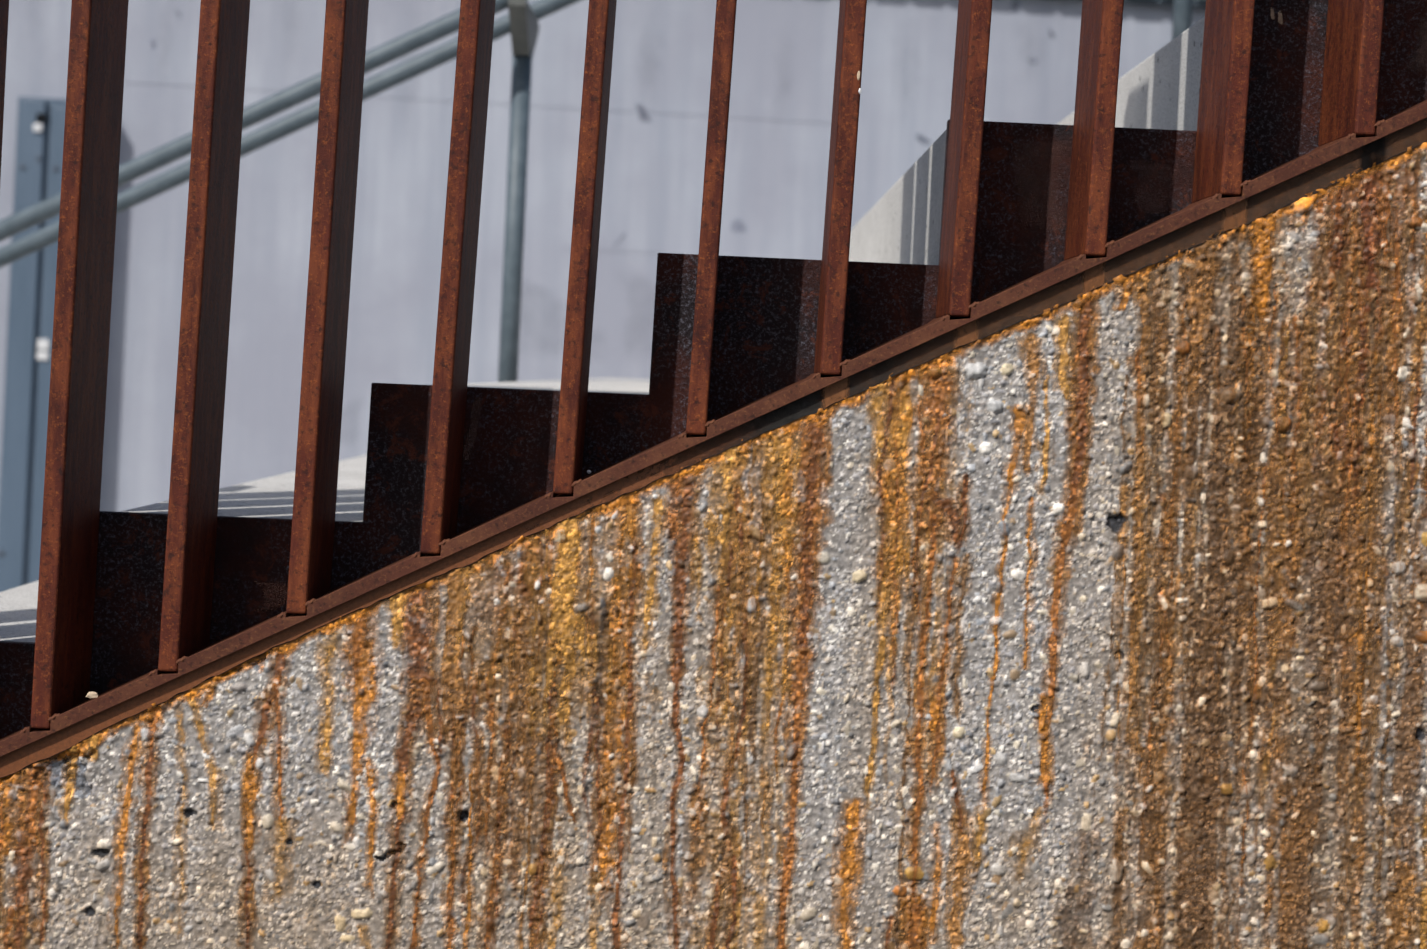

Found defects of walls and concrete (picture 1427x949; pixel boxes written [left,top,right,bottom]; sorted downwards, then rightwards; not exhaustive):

corrosion [1002,332,1044,520]
corrosion [1408,232,1427,455]
corrosion [114,723,142,946]
corrosion [366,760,377,886]
corrosion [689,716,708,832]
corrosion [837,798,862,949]
corrosion [864,635,886,796]
corrosion [903,536,921,721]
corrosion [946,769,985,949]
corrosion [982,536,1008,800]
corrosion [1111,811,1125,949]
corrosion [1383,513,1427,949]